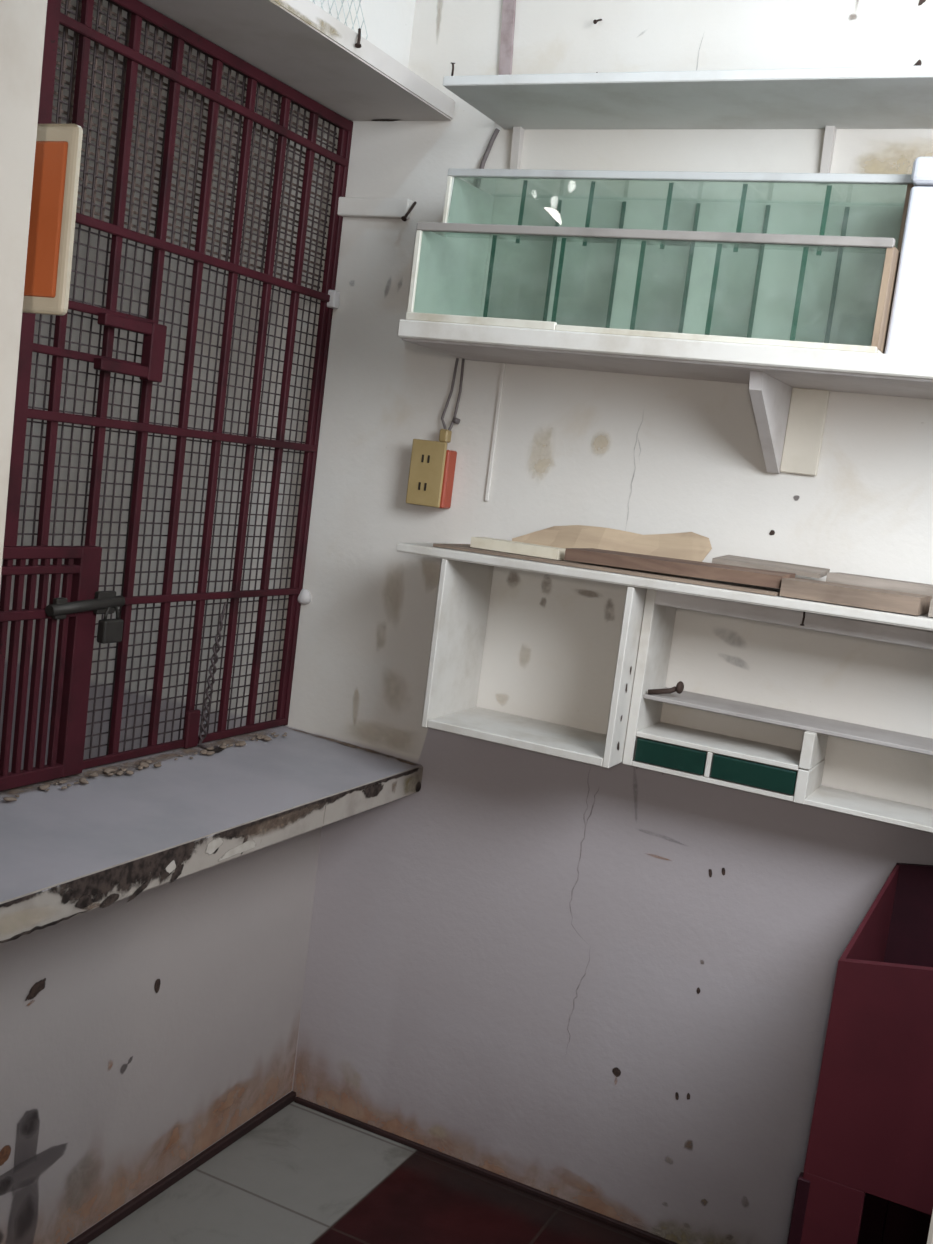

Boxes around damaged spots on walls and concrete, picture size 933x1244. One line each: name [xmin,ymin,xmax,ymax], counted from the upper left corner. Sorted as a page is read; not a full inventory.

spalling [0,768,419,943]
damp [0,1062,508,1244]
damp [532,1180,639,1223]